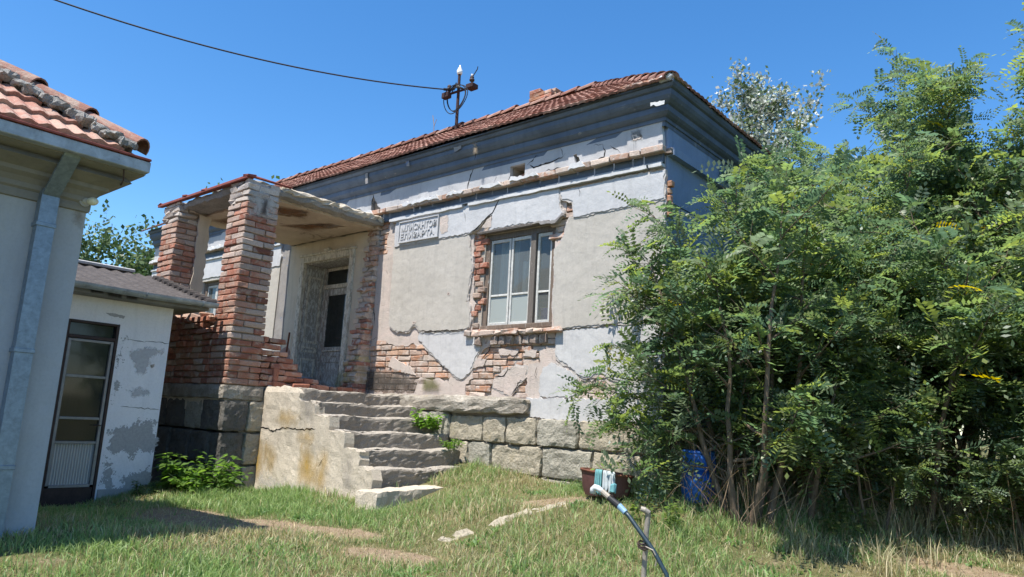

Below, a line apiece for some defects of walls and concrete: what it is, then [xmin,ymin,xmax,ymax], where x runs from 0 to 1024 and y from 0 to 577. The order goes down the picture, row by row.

flaking render [367,169,675,399]
peeling [113,335,163,404]
crack [481,345,537,395]
peeling [98,417,159,489]
crack [261,425,315,433]